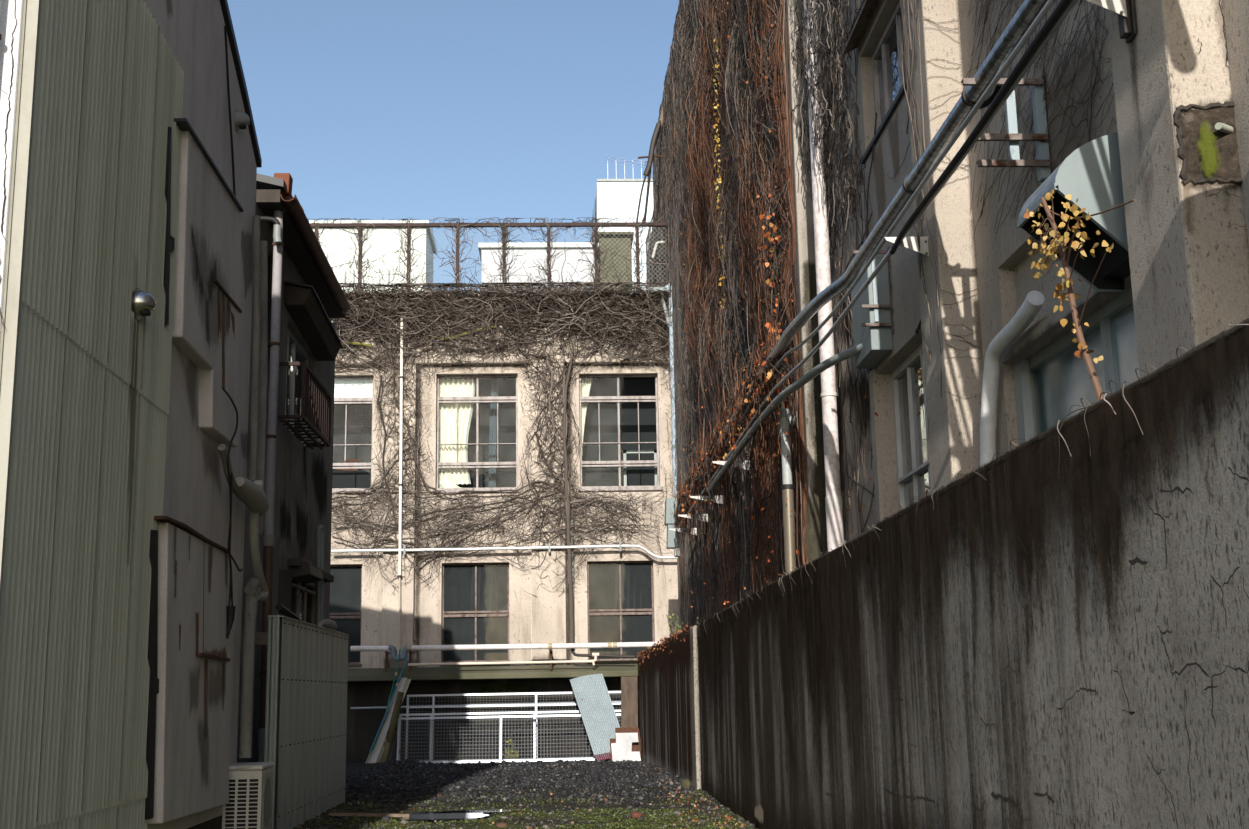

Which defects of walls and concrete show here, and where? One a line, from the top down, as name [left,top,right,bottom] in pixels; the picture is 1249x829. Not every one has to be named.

crack [0,0,17,281]
leakage [1175,108,1242,231]
leakage [192,232,230,344]
leakage [697,262,1249,829]
crack [1129,487,1193,569]
crack [1210,567,1249,627]
crack [1228,467,1249,481]
corrosion [196,613,227,737]
crack [1147,626,1249,828]